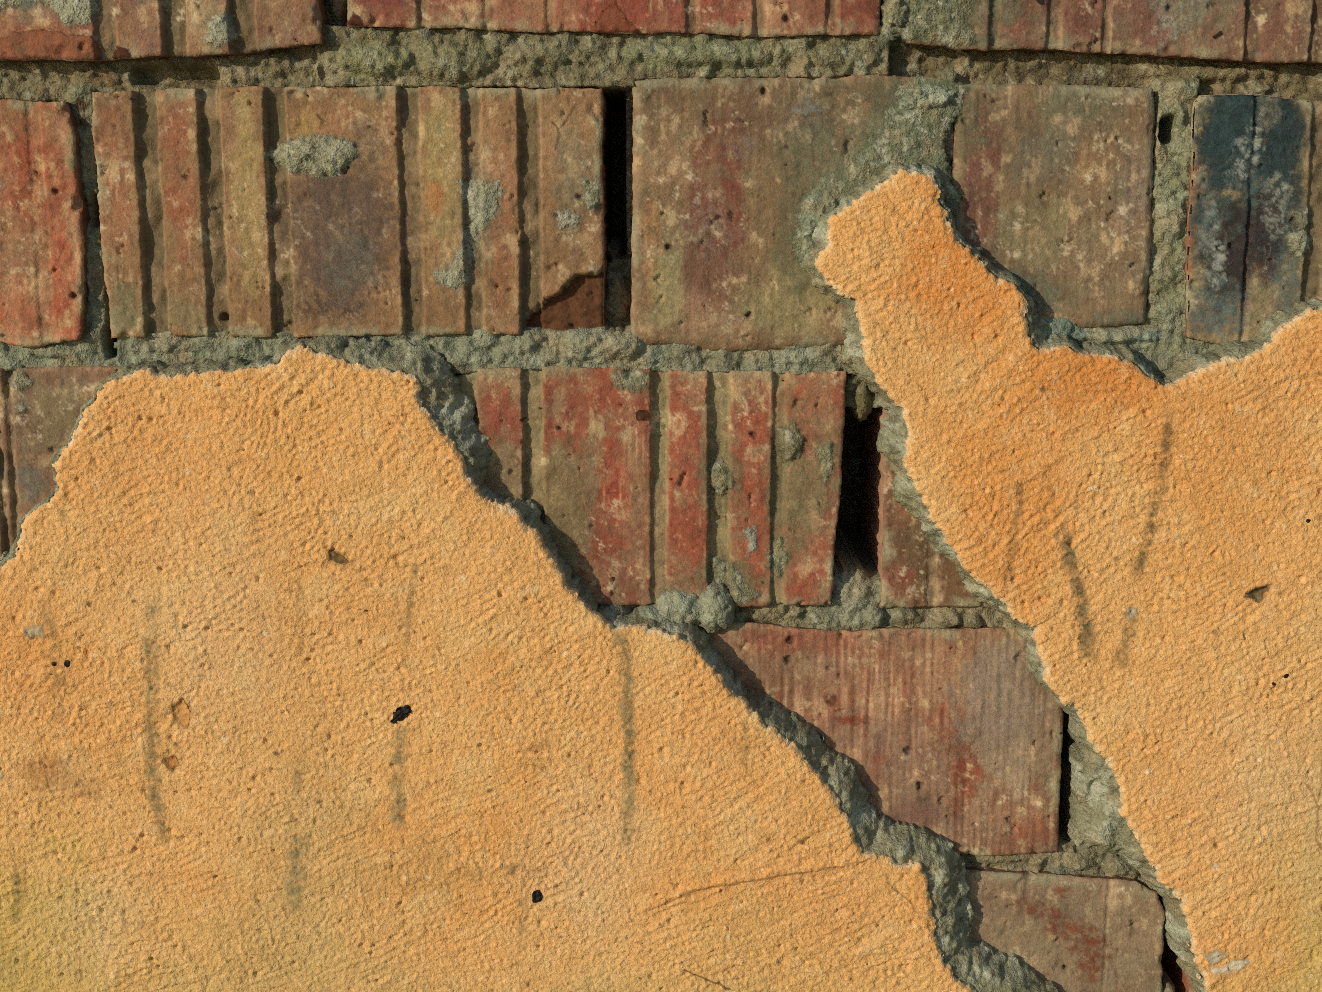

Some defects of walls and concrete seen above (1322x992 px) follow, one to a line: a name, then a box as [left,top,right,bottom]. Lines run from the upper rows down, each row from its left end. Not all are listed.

peeling [882,0,909,28]
spalling [0,29,130,61]
peeling [899,83,959,110]
peeling [581,177,600,212]
peeling [799,189,838,242]
spalling [526,272,604,331]
spalling [634,410,650,421]
peeling [706,457,734,497]
spalling [329,550,348,564]
peeling [711,525,791,604]
spalling [1243,586,1269,603]
peeling [1205,951,1248,974]